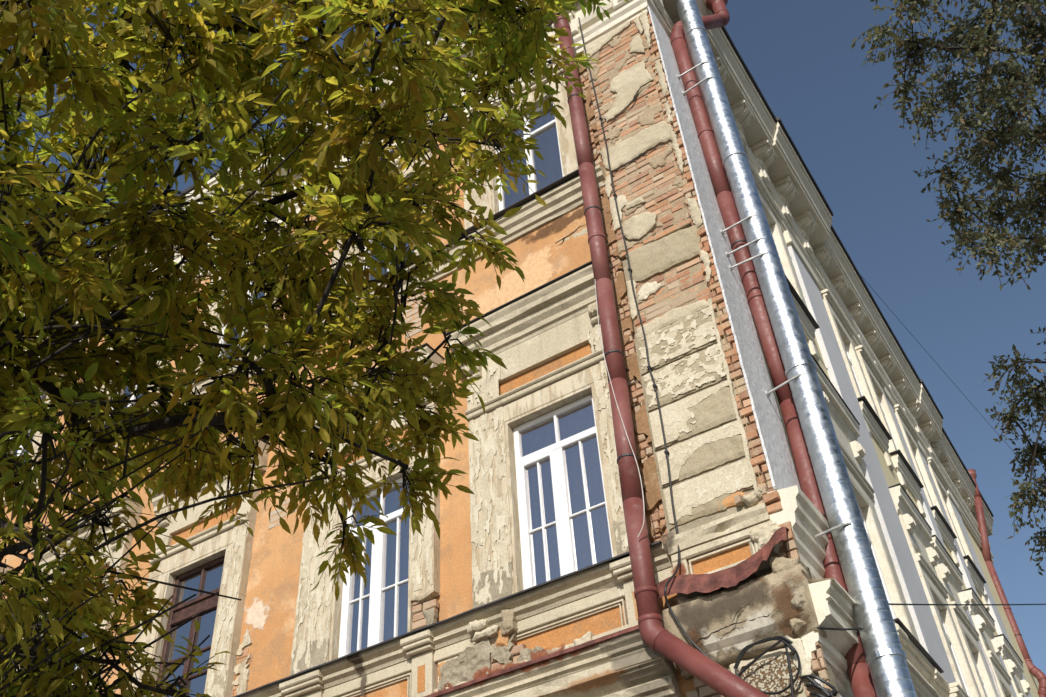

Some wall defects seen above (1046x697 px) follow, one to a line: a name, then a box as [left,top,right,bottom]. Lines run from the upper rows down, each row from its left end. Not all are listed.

spalling [576,10,835,697]
peeling [206,521,253,697]
peeling [268,489,340,676]
peeling [410,491,439,631]
peeling [437,361,595,690]
corrosion [671,563,686,576]
crack [695,604,776,642]